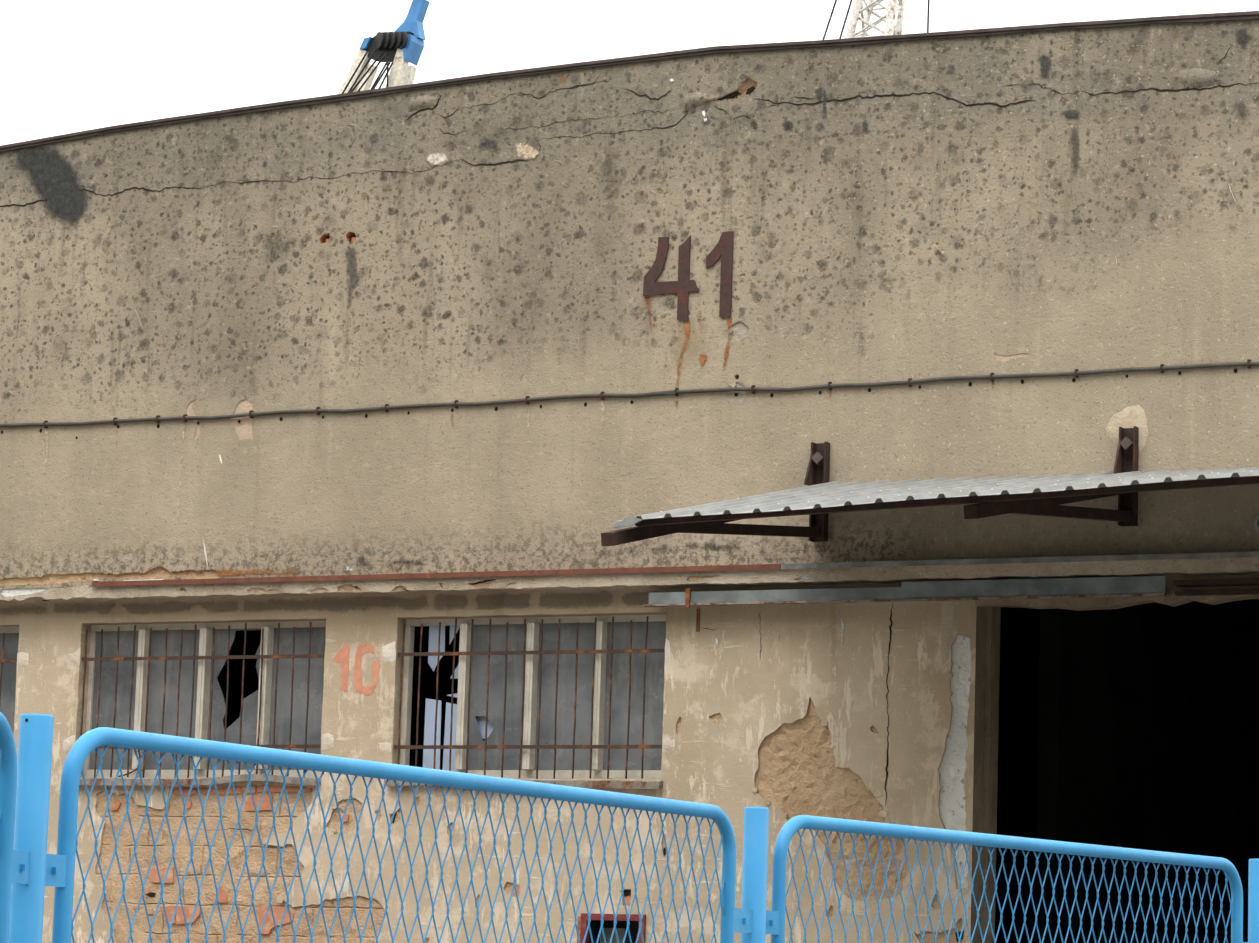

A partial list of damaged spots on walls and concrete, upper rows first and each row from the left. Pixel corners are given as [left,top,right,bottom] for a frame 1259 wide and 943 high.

crack [760,48,1256,107]
crack [82,76,686,196]
crack [0,199,46,207]
damp [17,149,87,220]
corrosion [677,322,690,380]
spalling [229,399,254,440]
spalling [0,566,222,597]
spalling [308,584,361,592]
crack [877,604,893,805]
spalling [326,798,400,833]
spalling [752,697,909,901]
spalling [95,784,385,943]